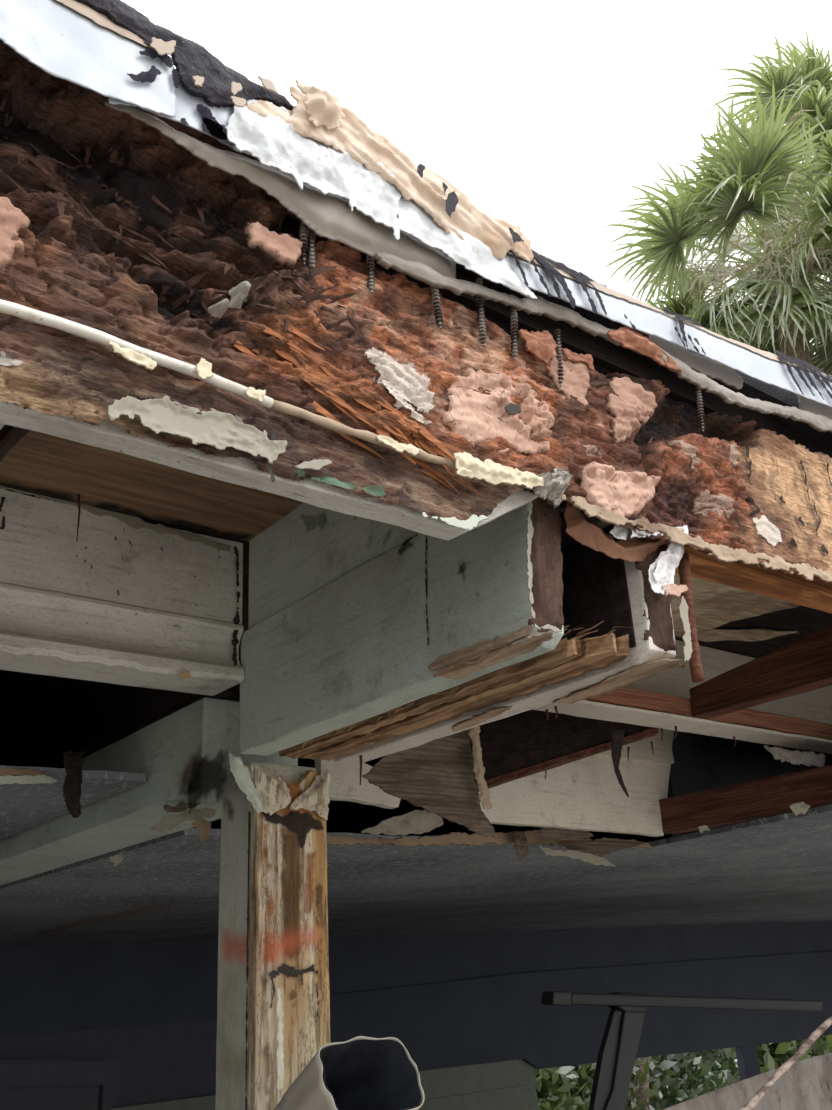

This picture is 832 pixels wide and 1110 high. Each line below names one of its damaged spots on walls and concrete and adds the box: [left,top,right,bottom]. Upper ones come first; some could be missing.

peeling [150,37,176,56]
peeling [224,76,537,299]
spalling [0,89,244,331]
peeling [108,395,287,464]
peeling [294,459,332,470]
peeling [422,512,489,530]
spalling [327,830,652,849]